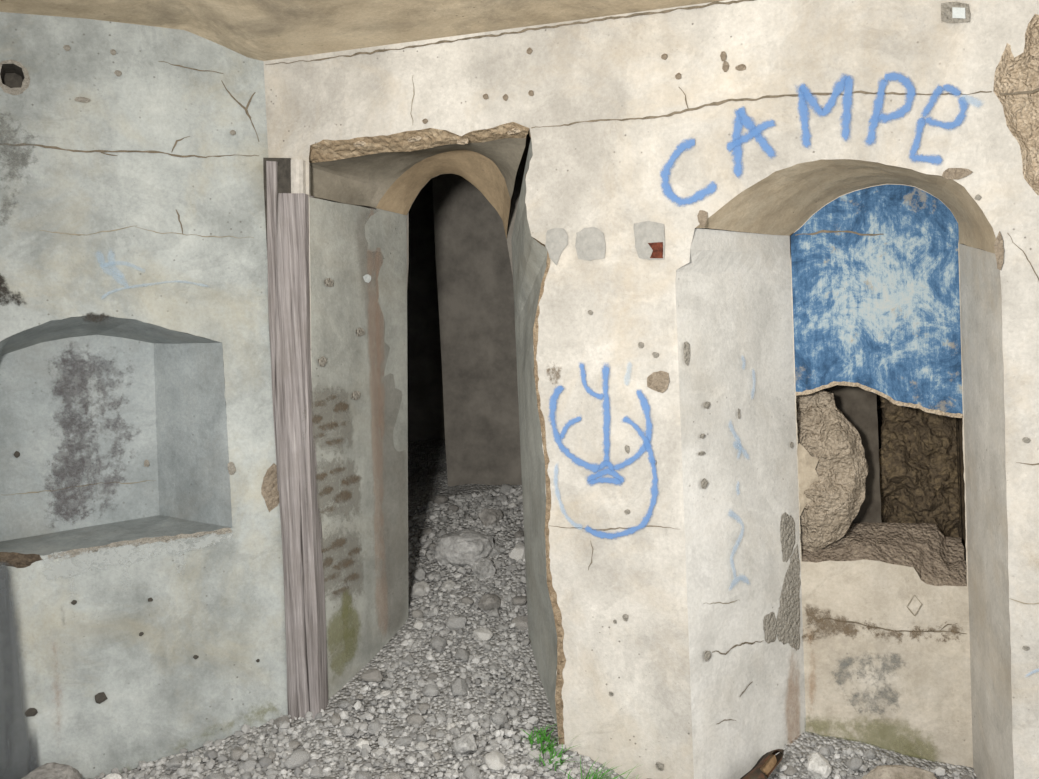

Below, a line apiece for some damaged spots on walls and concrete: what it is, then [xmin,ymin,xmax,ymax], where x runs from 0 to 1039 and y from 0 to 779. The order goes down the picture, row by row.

crack [265,0,754,65]
crack [1,61,259,158]
crack [531,87,1039,128]
spalling [993,14,1039,195]
leakage [47,350,131,521]
leakage [311,388,361,520]
spalling [763,381,967,651]
leakage [321,533,363,650]
crack [714,640,764,655]
leakage [835,655,900,712]